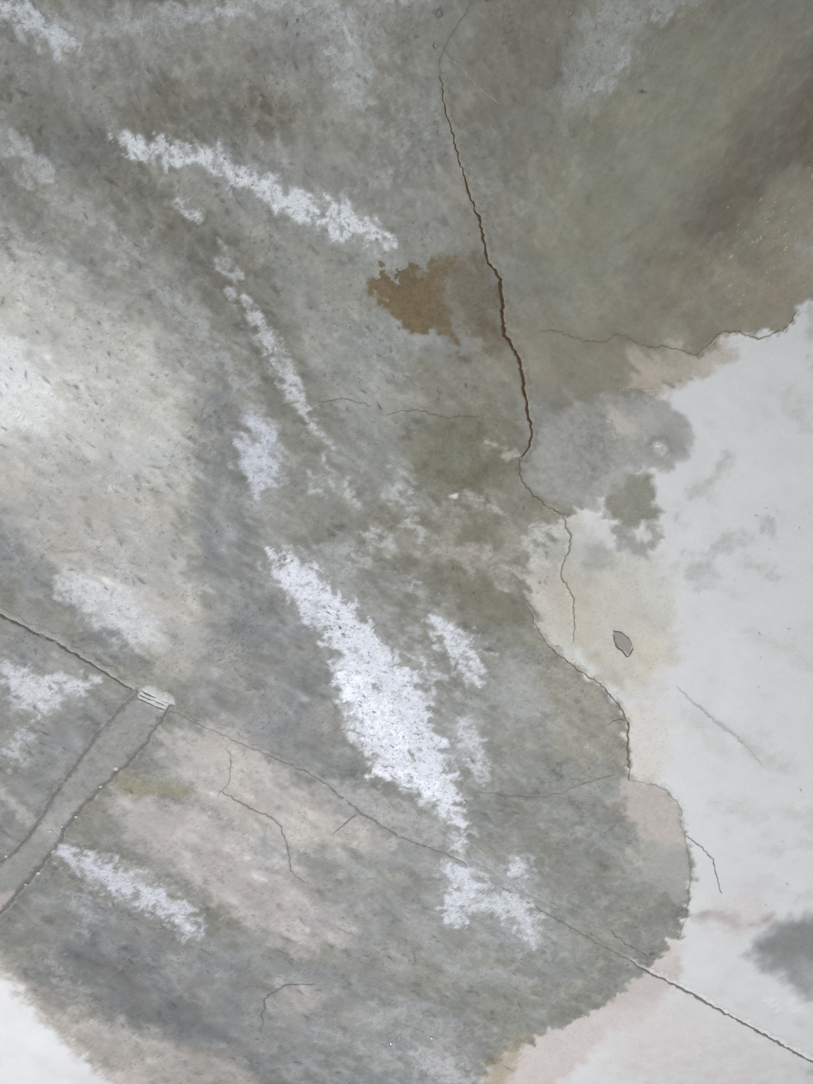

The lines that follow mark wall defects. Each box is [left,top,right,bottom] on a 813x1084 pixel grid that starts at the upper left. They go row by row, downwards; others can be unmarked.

rust [361,246,499,370]
crack [318,398,480,420]
water stain [446,478,515,530]
water stain [469,419,530,473]
crack [438,0,633,798]
water stain [668,444,744,527]
crack [0,605,140,691]
water stain [0,619,129,849]
crack [676,685,764,766]
crack [170,705,813,1064]